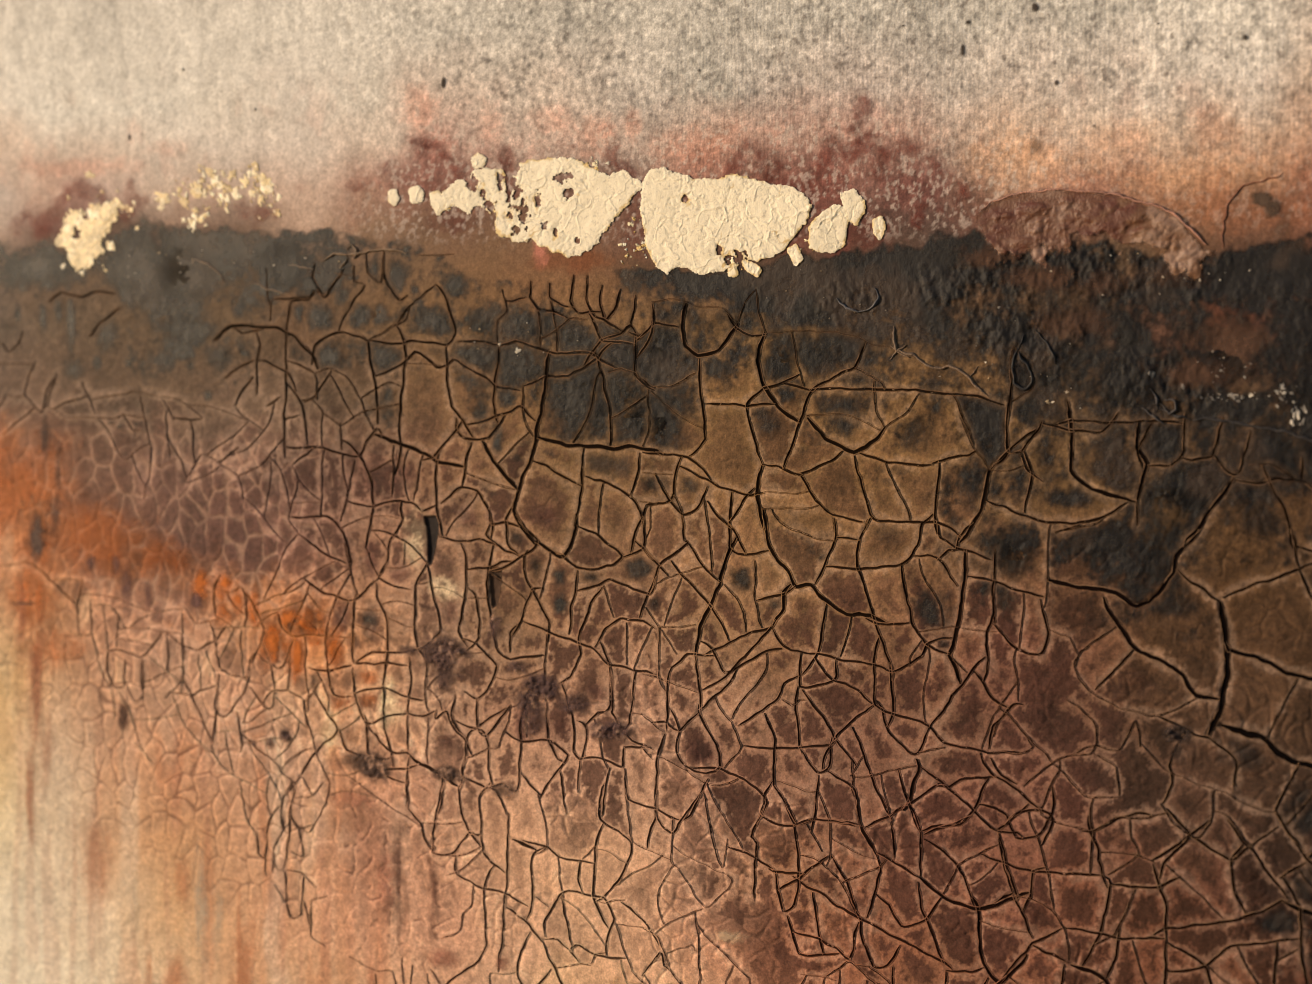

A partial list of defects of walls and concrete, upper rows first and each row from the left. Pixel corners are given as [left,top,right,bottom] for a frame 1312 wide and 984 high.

peeling [471,153,487,169]
peeling [388,185,445,214]
peeling [727,259,762,277]
peeling [787,243,804,266]
damp [0,218,1312,624]
corrosion [265,612,339,674]
damp [1261,909,1312,972]